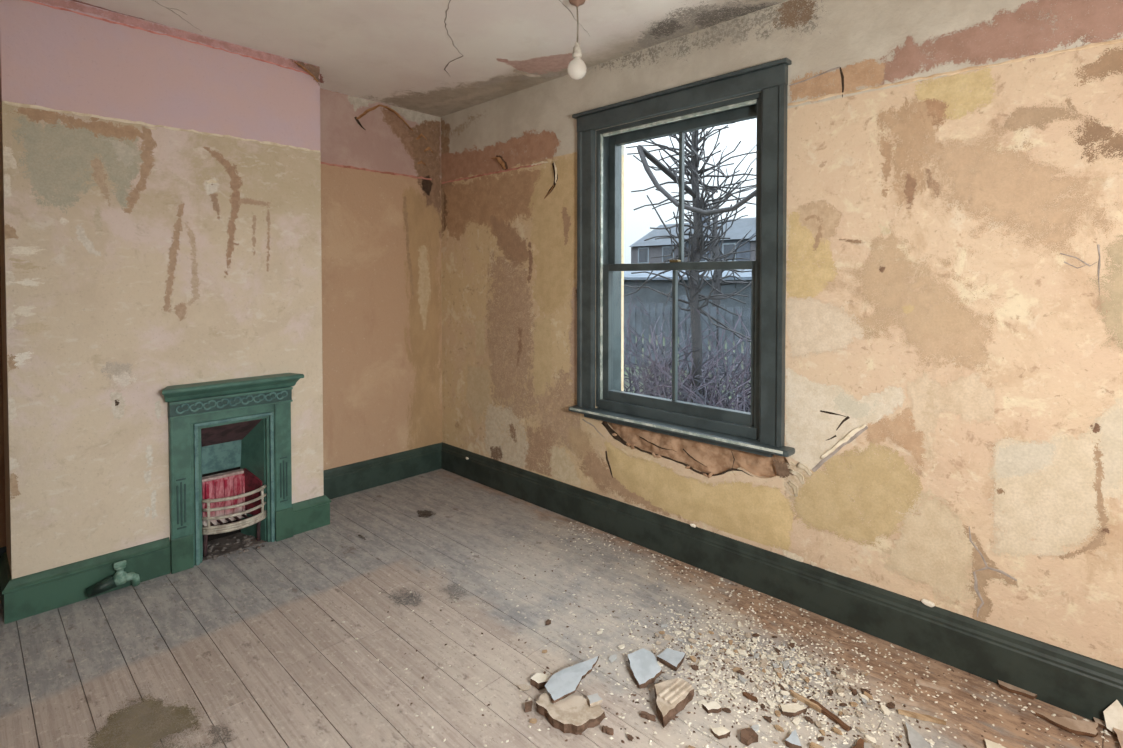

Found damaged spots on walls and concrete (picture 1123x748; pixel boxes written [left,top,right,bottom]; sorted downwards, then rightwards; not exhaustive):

crack [444,0,463,75]
damp [585,0,831,74]
peeling [788,0,1123,128]
peeling [408,110,577,398]
flaking render [601,200,926,500]